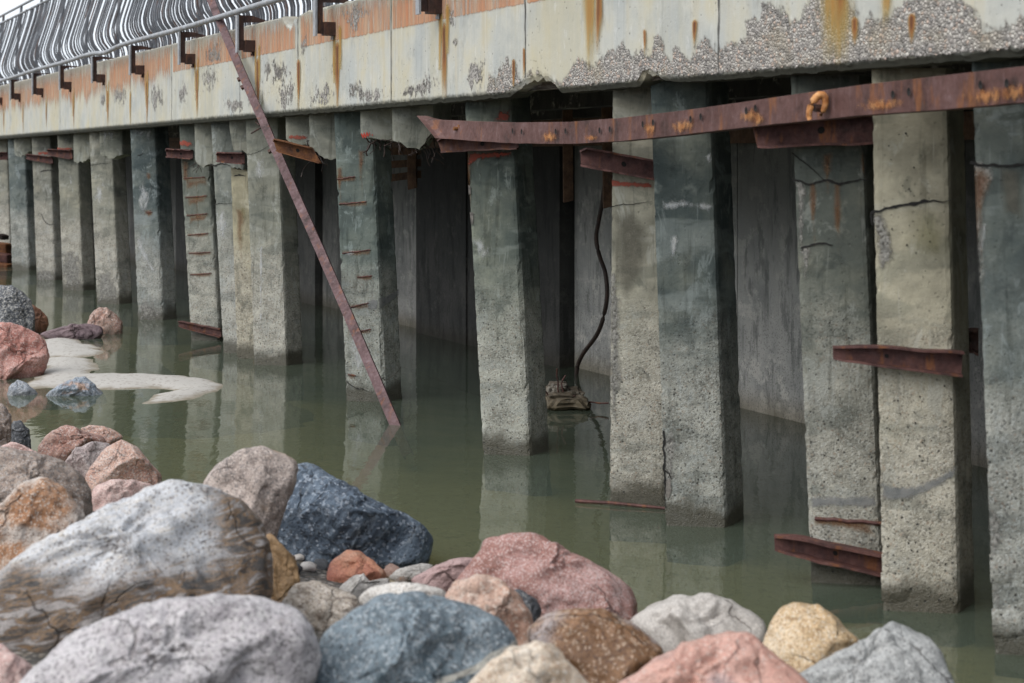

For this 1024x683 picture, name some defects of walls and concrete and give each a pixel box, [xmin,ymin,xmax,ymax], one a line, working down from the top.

rust [584,0,602,51]
rust [333,27,341,102]
rust [439,5,449,88]
rust [512,48,525,85]
spalling [467,0,1024,94]
rust [977,86,1022,102]
spalling [363,134,444,166]
crack [792,152,865,186]
crack [969,160,1024,168]
crack [870,199,951,226]
crack [662,430,672,508]